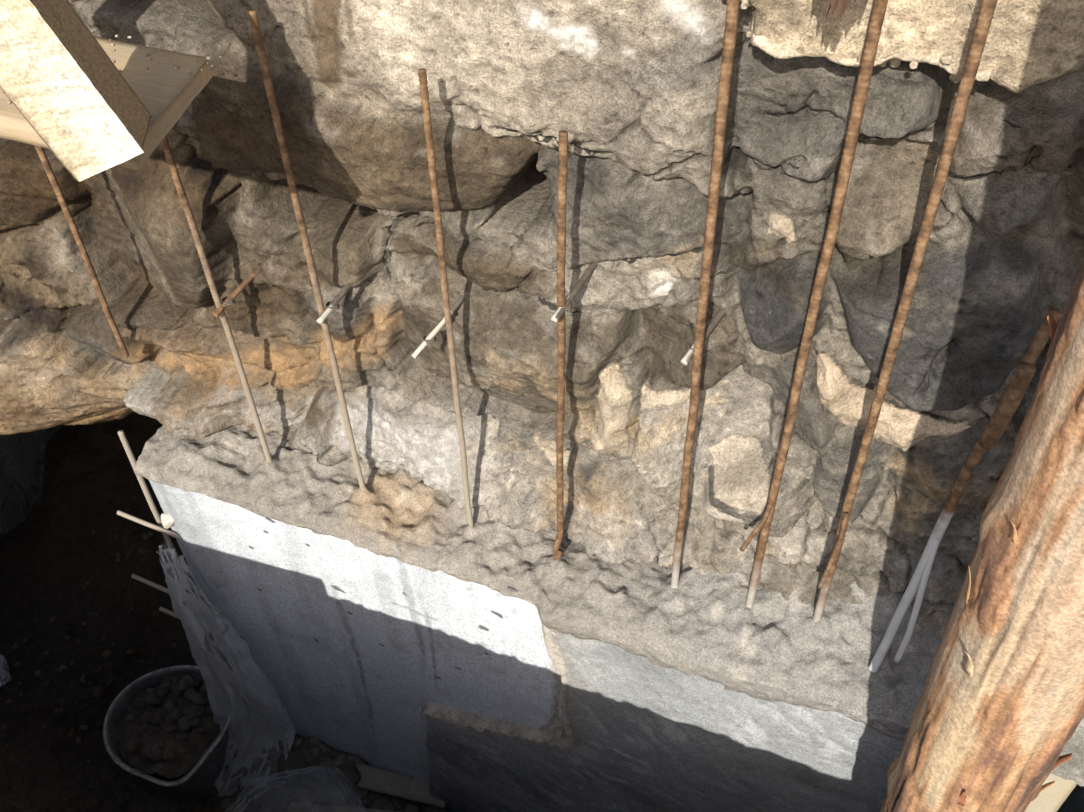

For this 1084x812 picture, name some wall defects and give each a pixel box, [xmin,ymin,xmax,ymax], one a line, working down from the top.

spalling [422,624,577,753]